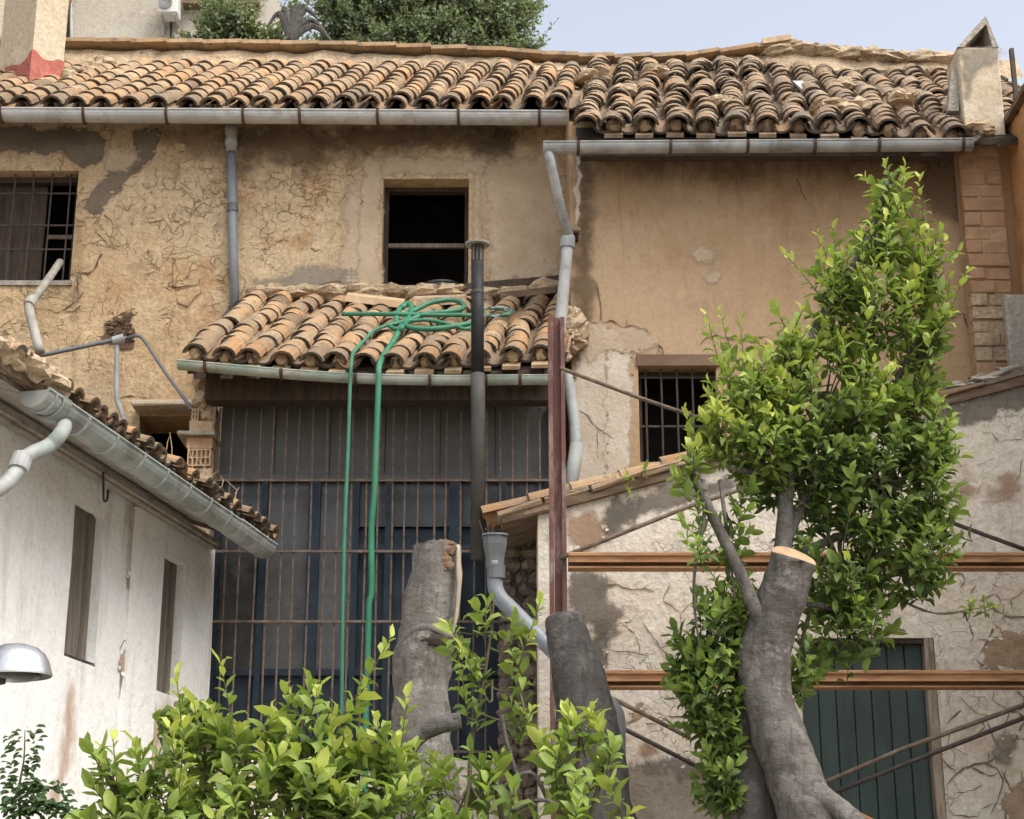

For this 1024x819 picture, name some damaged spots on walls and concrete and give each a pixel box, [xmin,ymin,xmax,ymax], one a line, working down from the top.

peeling [0,124,162,217]
crack [36,142,349,315]
peeling [565,305,659,480]
peeling [567,510,609,552]
crack [973,412,1024,540]
damp [567,572,624,648]
crack [942,572,1024,819]
spalling [983,631,1024,670]